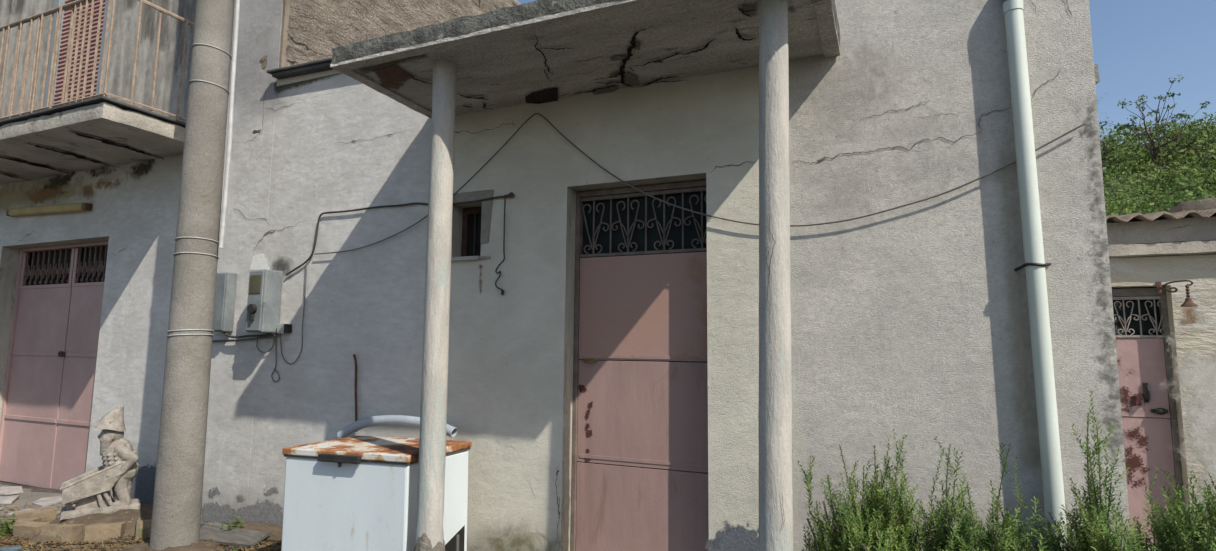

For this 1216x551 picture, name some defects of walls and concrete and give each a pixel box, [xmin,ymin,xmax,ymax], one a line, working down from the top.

spalling [358,54,426,90]
crack [535,7,756,97]
crack [792,69,1061,164]
rust [579,385,593,461]
rust [1117,358,1150,488]